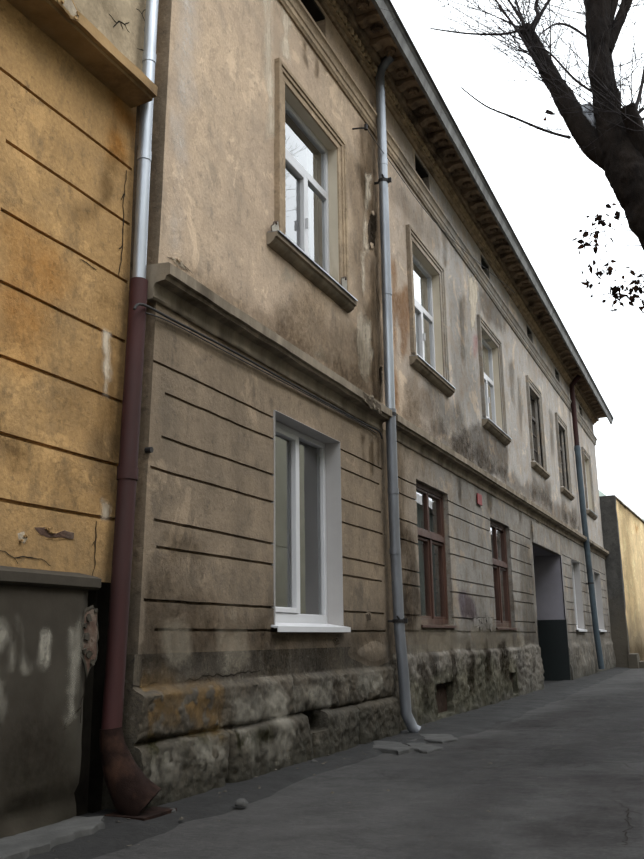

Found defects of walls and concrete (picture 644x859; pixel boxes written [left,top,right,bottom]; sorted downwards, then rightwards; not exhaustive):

crack [119,170,127,272]
spalling [15,526,76,547]
crack [0,550,51,566]